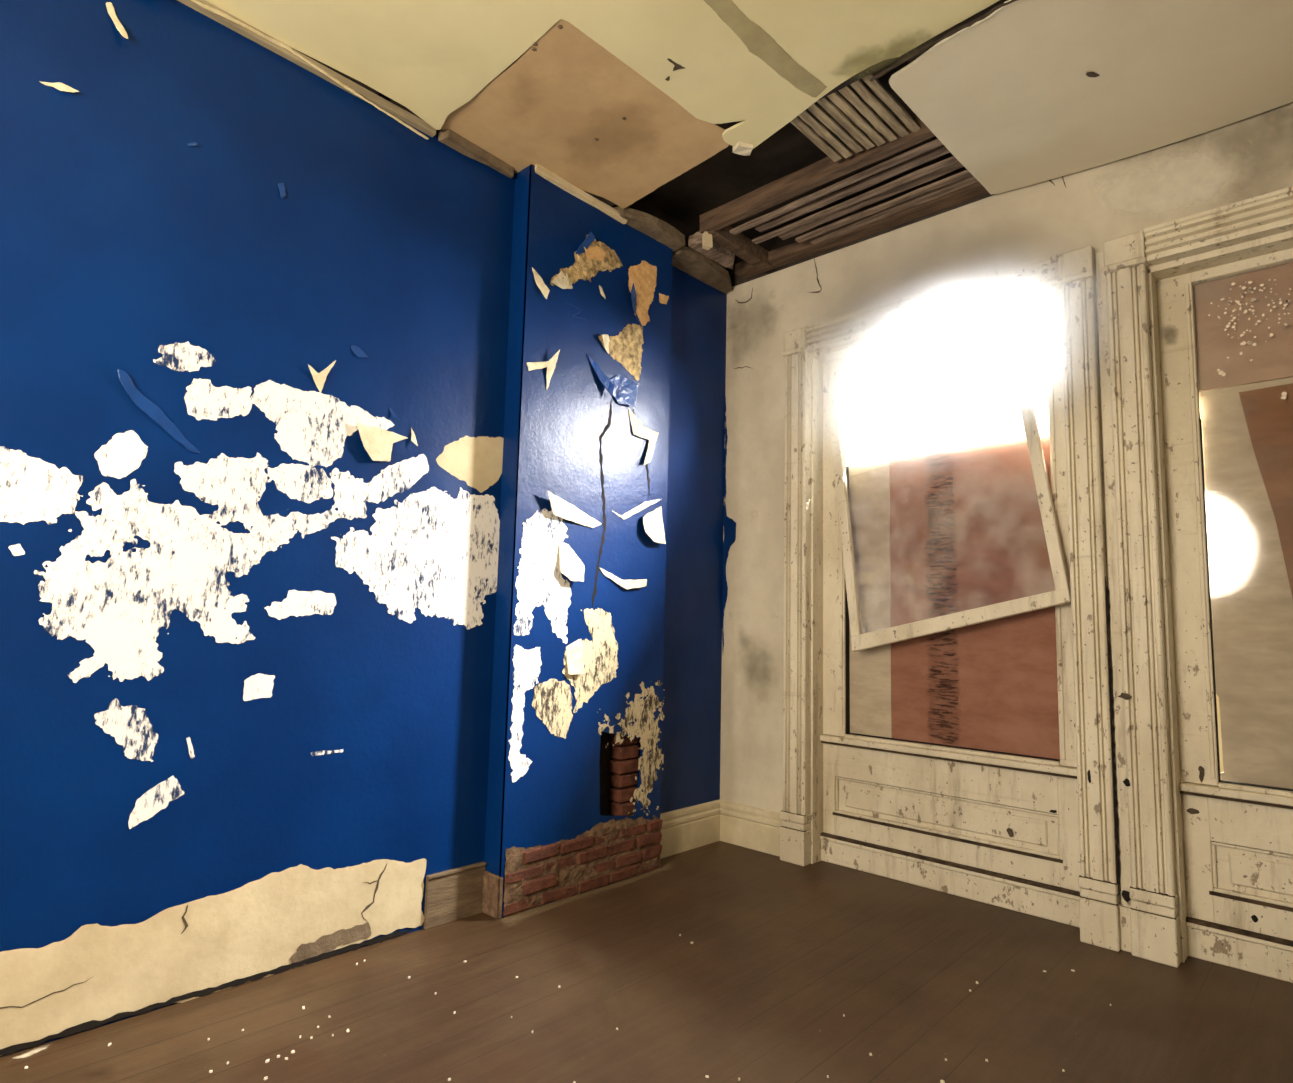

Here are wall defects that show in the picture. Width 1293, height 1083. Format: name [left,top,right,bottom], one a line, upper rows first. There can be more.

peeling [526,350,560,390]
peeling [532,207,735,465]
peeling [0,341,504,683]
crack [592,399,650,607]
peeling [94,699,158,762]
peeling [128,776,184,829]
peeling [243,673,275,701]
flaking render [482,491,666,919]
flaking render [0,858,426,1056]